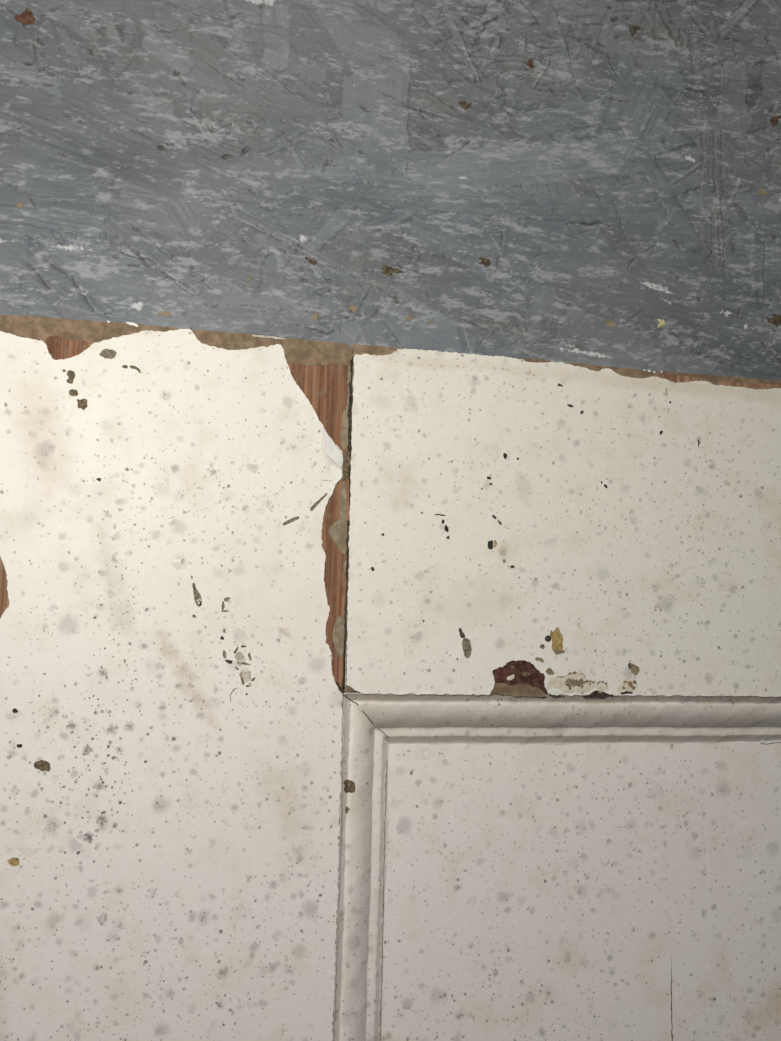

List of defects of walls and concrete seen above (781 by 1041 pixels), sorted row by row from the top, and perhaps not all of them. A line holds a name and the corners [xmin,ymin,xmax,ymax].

peeling [0,315,179,410]
peeling [192,329,394,693]
peeling [0,557,10,618]
peeling [490,627,614,698]
crack [668,978,676,1041]